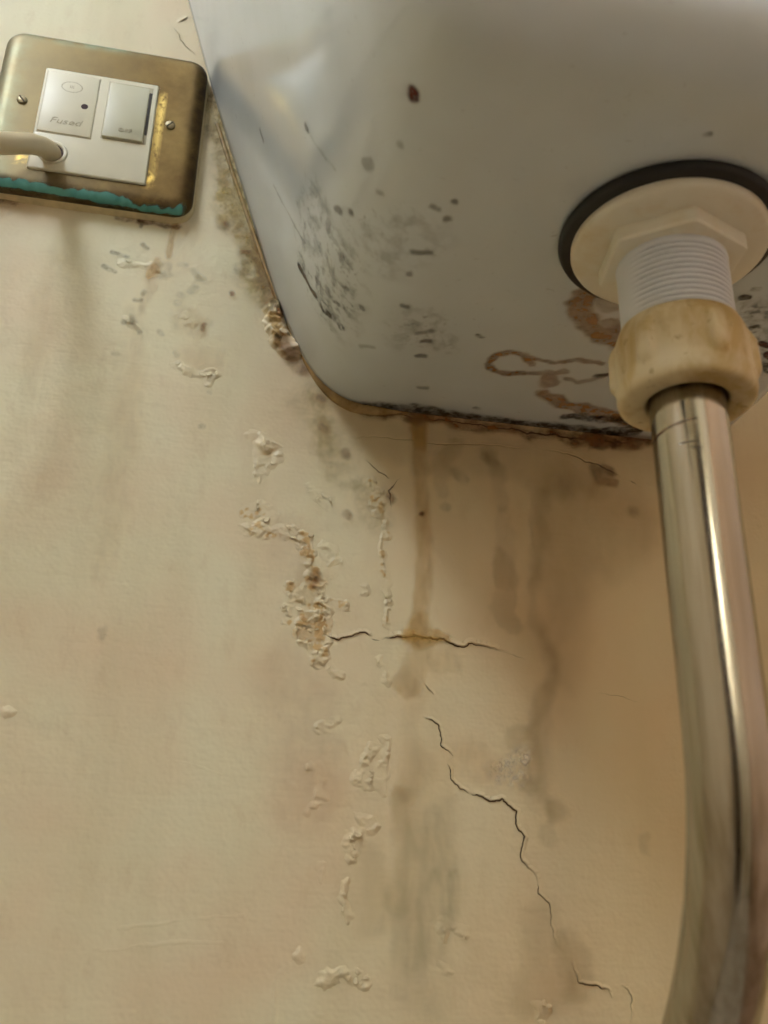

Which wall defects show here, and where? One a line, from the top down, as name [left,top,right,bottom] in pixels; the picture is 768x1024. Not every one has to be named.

leakage [207,100,283,315]
corrosion [567,290,620,347]
corrosion [486,351,568,376]
corrosion [538,391,636,429]
flaking render [244,429,285,484]
peeling [237,499,351,681]
crack [326,628,514,654]
peeling [349,734,392,798]
crack [424,683,635,1024]
peeling [313,965,373,992]